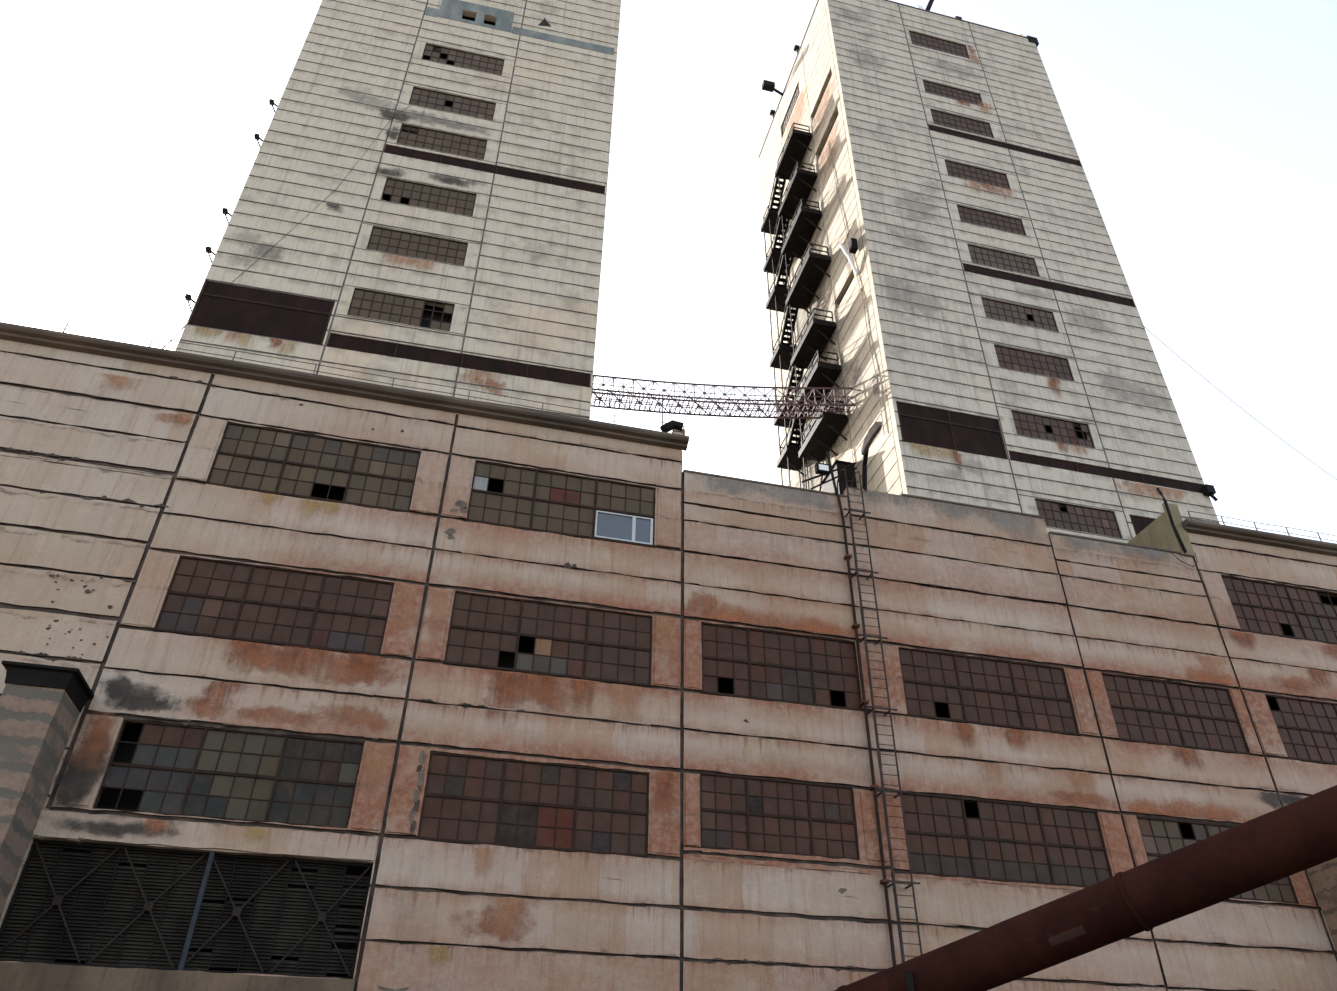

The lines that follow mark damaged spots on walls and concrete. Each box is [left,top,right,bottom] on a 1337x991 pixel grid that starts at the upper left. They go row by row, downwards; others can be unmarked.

rust [787,89,837,162]
rust [230,641,392,685]
rust [189,682,241,716]
rust [238,708,309,722]
rust [479,897,522,941]